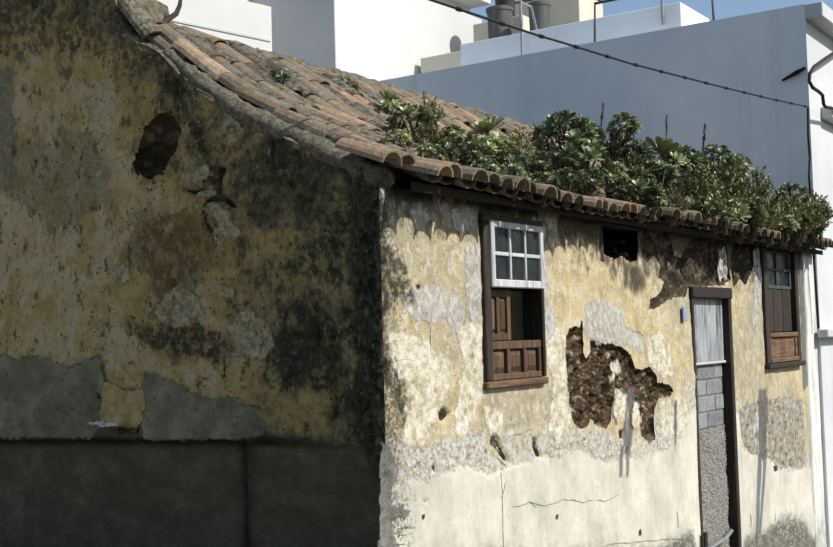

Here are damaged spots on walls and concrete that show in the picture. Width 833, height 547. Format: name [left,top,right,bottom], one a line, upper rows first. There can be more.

flaking render [130,105,182,184]
flaking render [637,229,762,332]
flaking render [532,211,691,462]
peeling [0,353,105,441]
peeling [117,373,266,443]
peeling [378,243,506,547]
peeling [740,396,806,471]
crack [498,458,619,512]